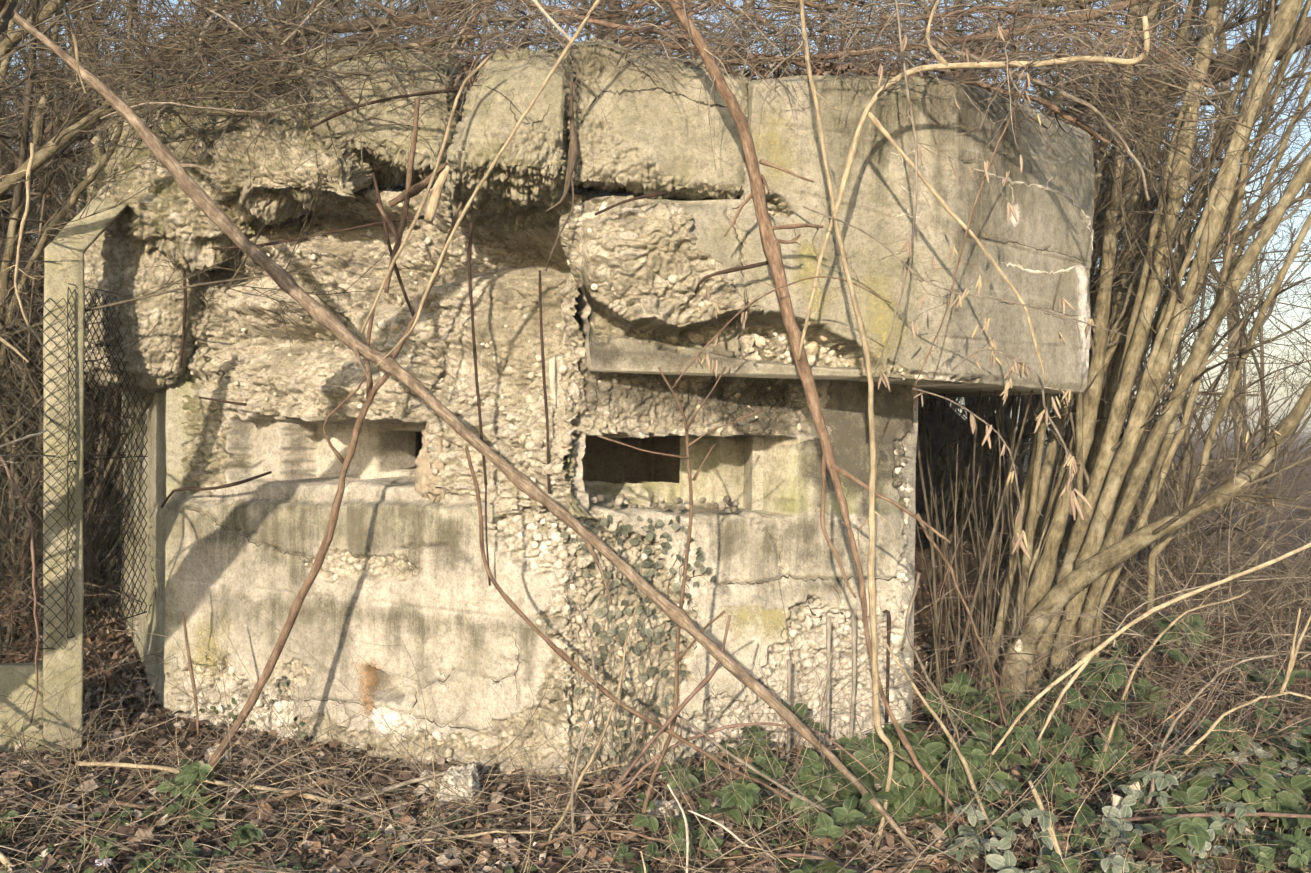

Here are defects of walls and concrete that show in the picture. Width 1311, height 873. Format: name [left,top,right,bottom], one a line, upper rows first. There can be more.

crack [589,54,727,110]
spalling [165,188,979,781]
crack [188,509,313,559]
crack [146,508,157,621]
rust [360,663,380,713]